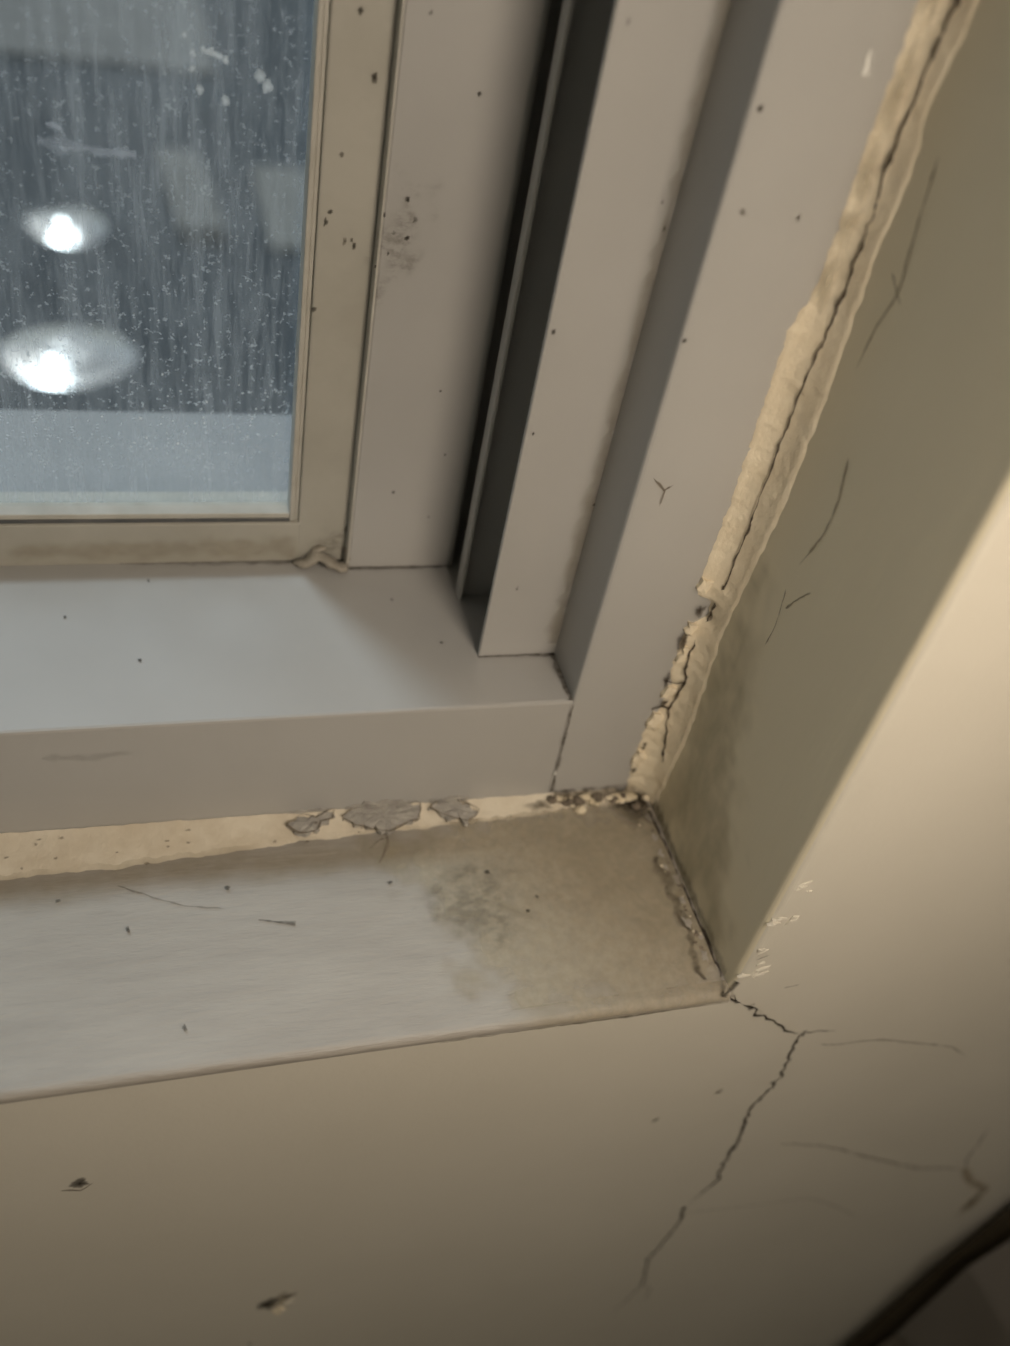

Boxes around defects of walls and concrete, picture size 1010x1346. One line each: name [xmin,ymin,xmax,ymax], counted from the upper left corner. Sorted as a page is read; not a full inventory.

crack [652,0,961,762]
spalling [630,577,714,772]
peeling [286,795,479,837]
leakage [387,806,730,1021]
crack [538,800,833,1307]